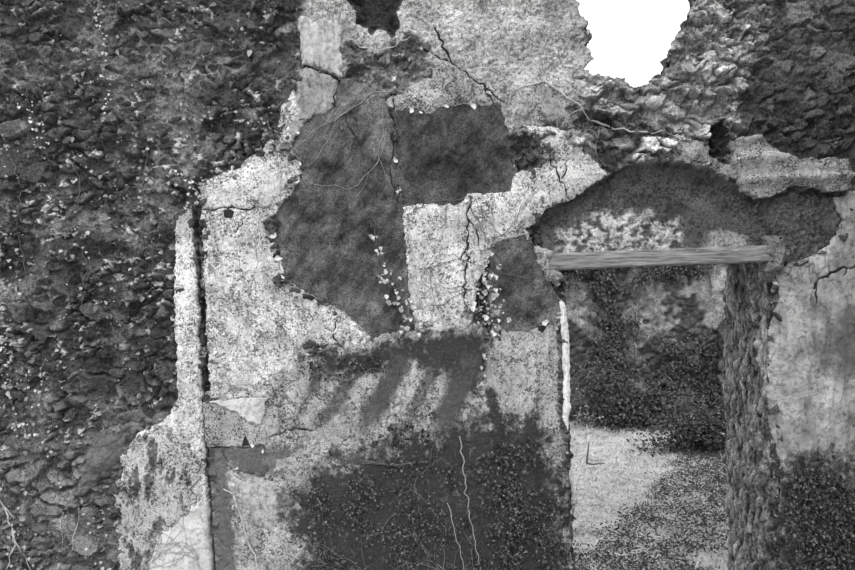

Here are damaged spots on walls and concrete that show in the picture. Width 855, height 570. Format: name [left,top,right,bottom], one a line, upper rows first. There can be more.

crack [420,27,508,109]
crack [461,198,479,319]
crack [813,266,855,305]